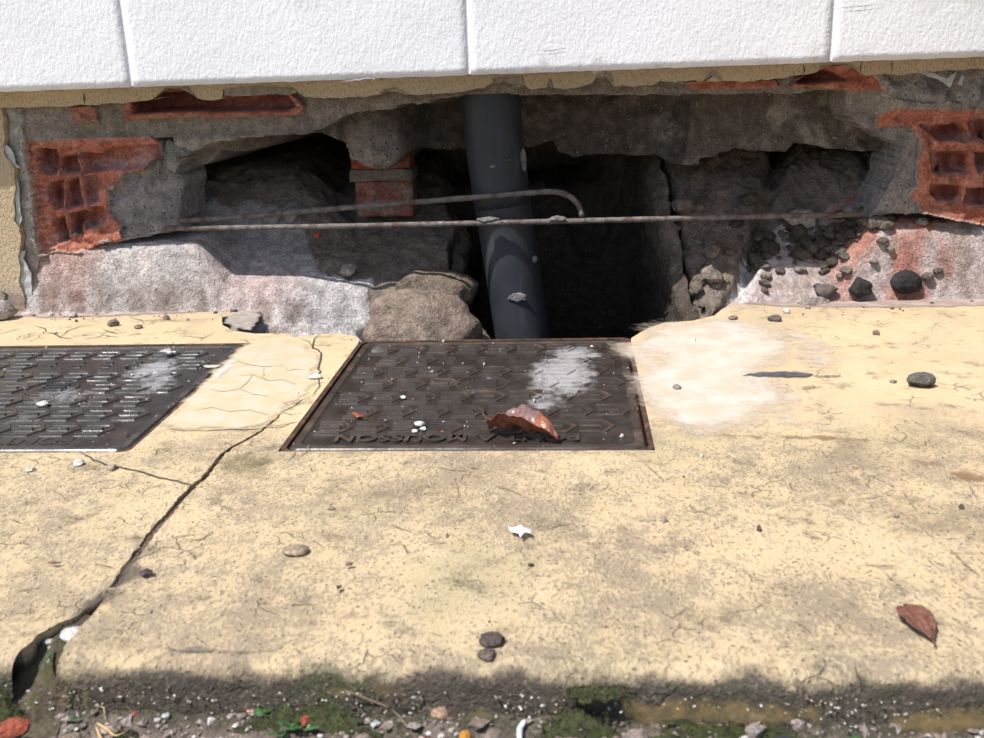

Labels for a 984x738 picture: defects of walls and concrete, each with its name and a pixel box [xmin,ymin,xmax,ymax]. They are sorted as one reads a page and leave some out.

spalling [224,86,298,97]
spalling [876,69,984,109]
spalling [5,107,47,296]
spalling [164,189,870,239]
crack [170,336,322,445]
crack [12,451,196,738]